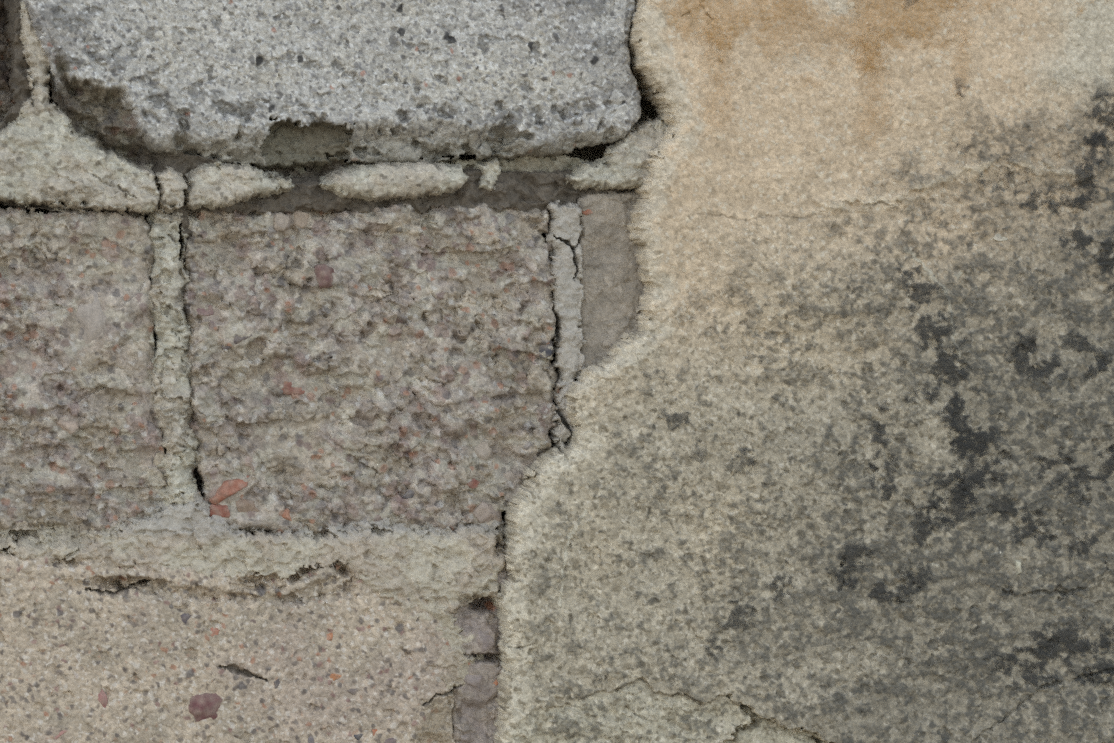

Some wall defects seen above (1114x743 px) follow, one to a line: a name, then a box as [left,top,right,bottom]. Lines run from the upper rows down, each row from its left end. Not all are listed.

crack [552,230,583,282]
crack [552,307,565,354]
crack [85,577,159,598]
crack [565,676,730,726]
crack [970,669,1109,743]